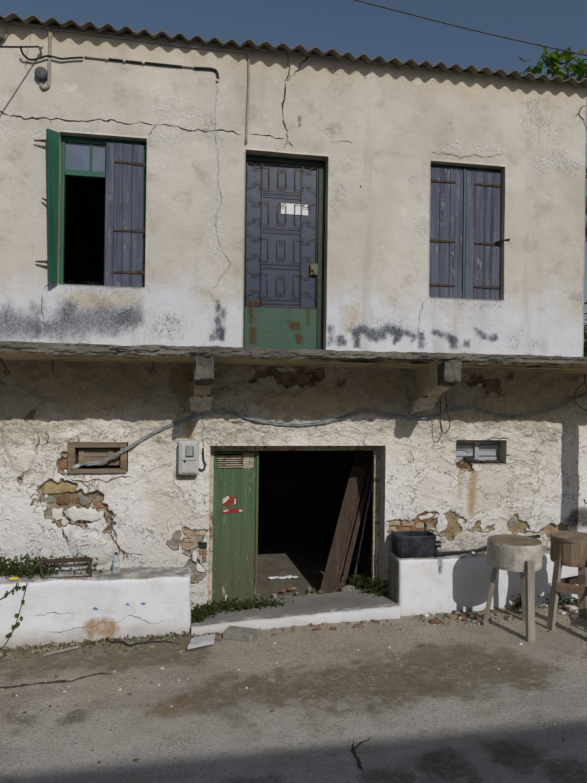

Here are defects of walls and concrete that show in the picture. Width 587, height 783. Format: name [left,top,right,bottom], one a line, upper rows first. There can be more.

crack [0,55,317,304]
leakage [0,305,136,338]
leakage [210,304,224,340]
leakage [328,323,470,347]
flaking render [247,366,325,389]
flaking render [467,373,514,395]
flaking render [37,451,117,534]
flaking render [379,445,496,603]
flaking render [507,514,569,541]
flaking render [166,527,208,584]
crack [0,672,110,688]